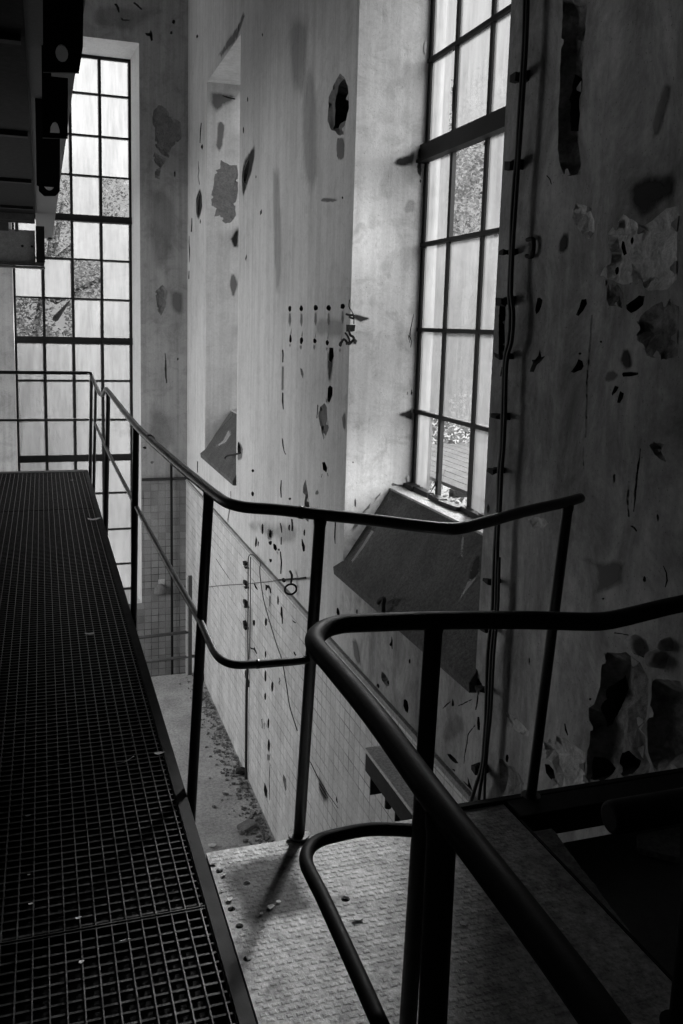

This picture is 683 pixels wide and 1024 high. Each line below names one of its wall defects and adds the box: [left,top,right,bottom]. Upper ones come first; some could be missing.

peeling [152,103,181,179]
spalling [327,74,349,159]
spalling [558,0,587,176]
peeling [196,148,254,223]
peeling [155,285,181,315]
spalling [572,203,679,360]
spalling [541,652,683,788]